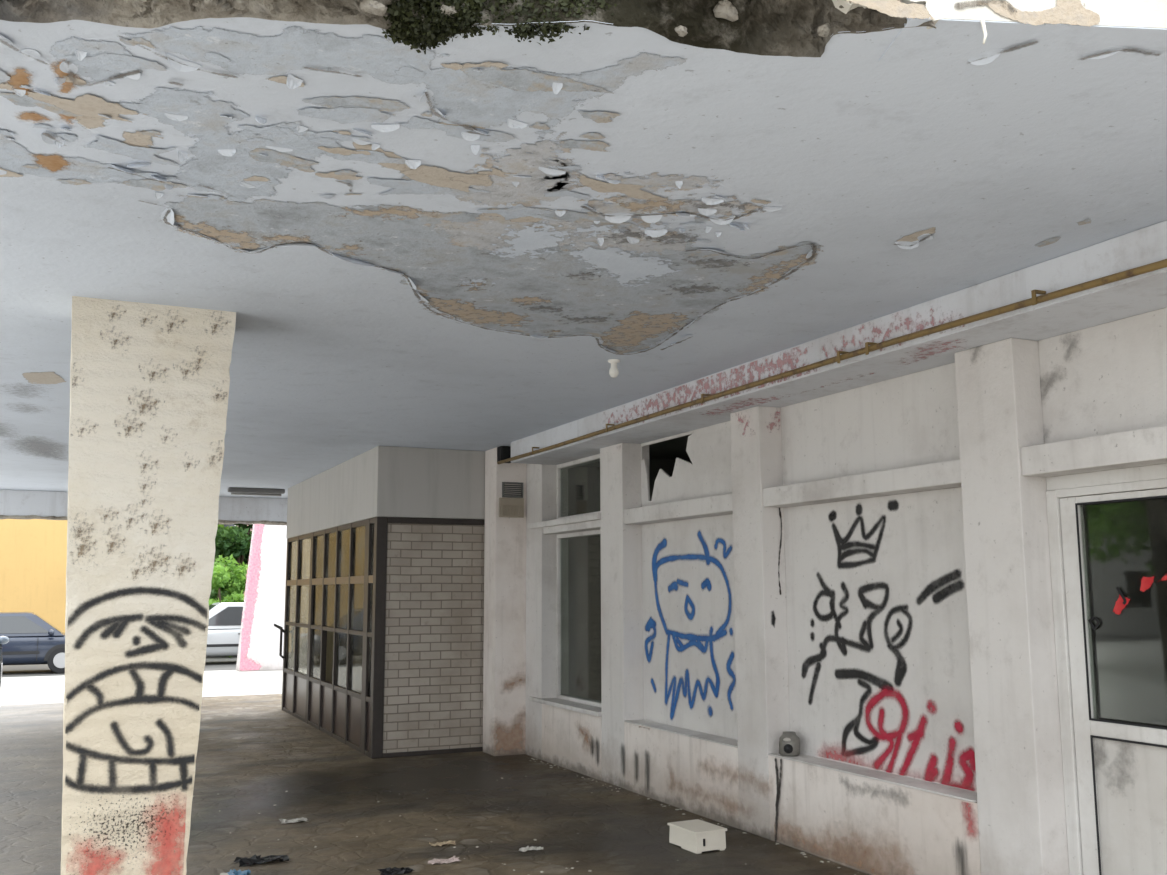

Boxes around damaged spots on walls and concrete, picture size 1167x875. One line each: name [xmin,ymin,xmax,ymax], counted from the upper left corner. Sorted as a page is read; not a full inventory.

flaking render [968,0,1100,65]
peeling [0,0,936,355]
peeling [23,372,66,384]
mould [77,461,169,557]
water stain [134,548,195,578]
water stain [622,747,649,789]
crack [774,758,782,842]